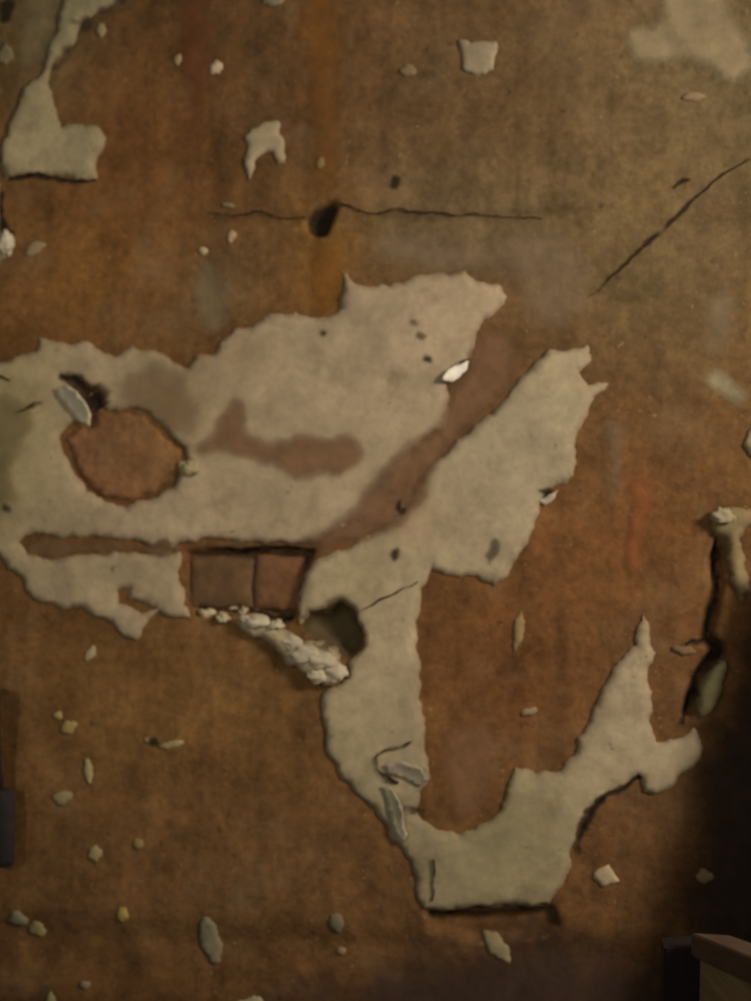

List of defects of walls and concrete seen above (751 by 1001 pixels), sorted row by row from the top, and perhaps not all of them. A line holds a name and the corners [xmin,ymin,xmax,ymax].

peeling [0,0,115,184]
peeling [209,60,223,75]
peeling [458,39,498,75]
peeling [244,120,286,180]
peeling [0,229,46,260]
crack [0,171,97,235]
crack [211,210,305,219]
crack [340,202,542,219]
crack [604,158,750,286]
flaking render [709,507,751,602]
peeling [0,270,729,911]
crack [681,546,726,724]